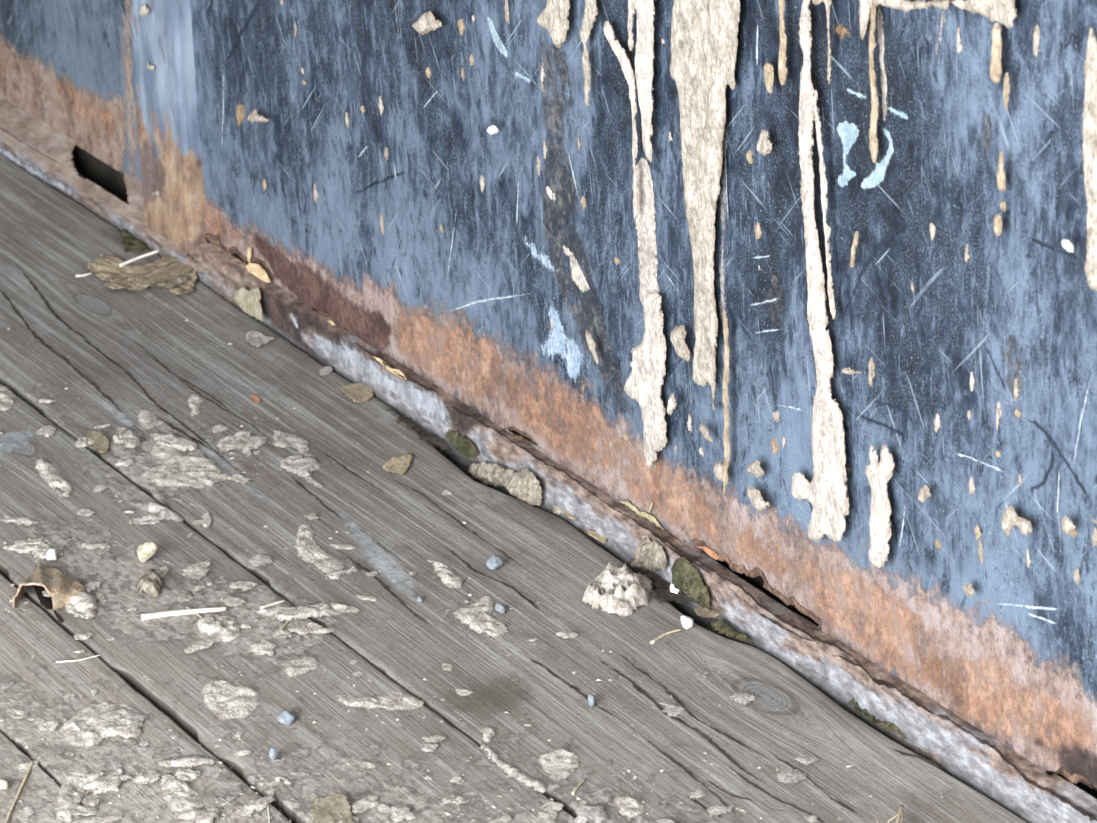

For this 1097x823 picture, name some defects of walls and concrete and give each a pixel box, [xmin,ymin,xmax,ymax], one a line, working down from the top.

corrosion [204,192,1097,788]